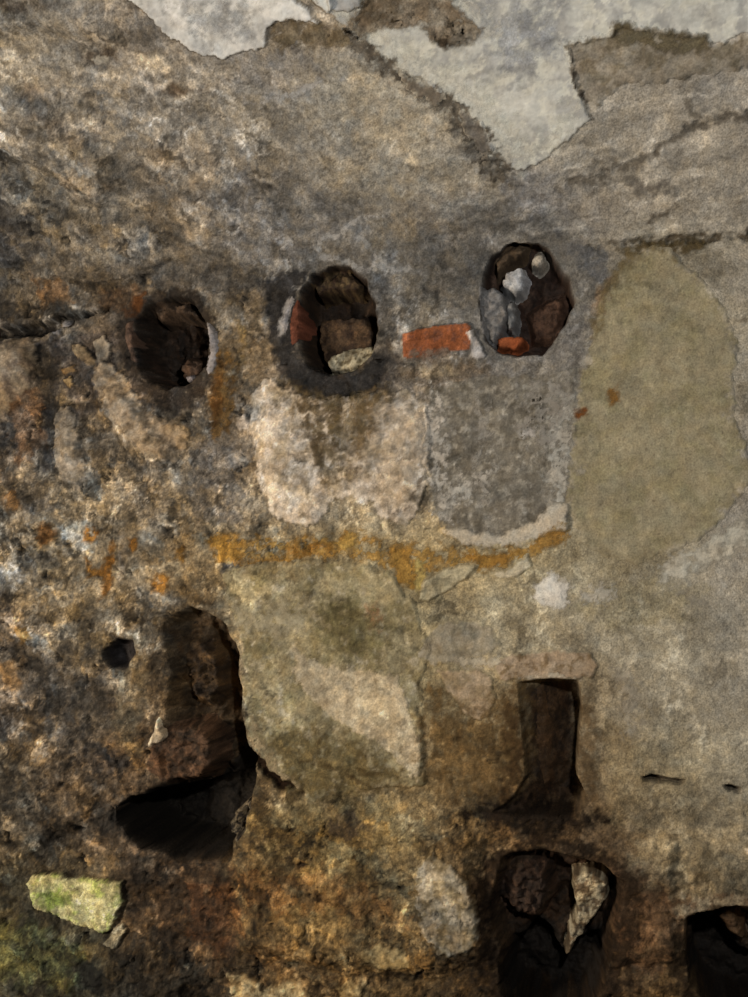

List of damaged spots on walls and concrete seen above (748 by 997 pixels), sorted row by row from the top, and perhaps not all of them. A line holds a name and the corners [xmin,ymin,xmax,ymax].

peeling [128,0,748,186]
crack [568,110,748,245]
corrosion [208,523,570,590]
crack [257,754,337,793]
spalling [490,678,589,820]
spalling [662,888,748,923]